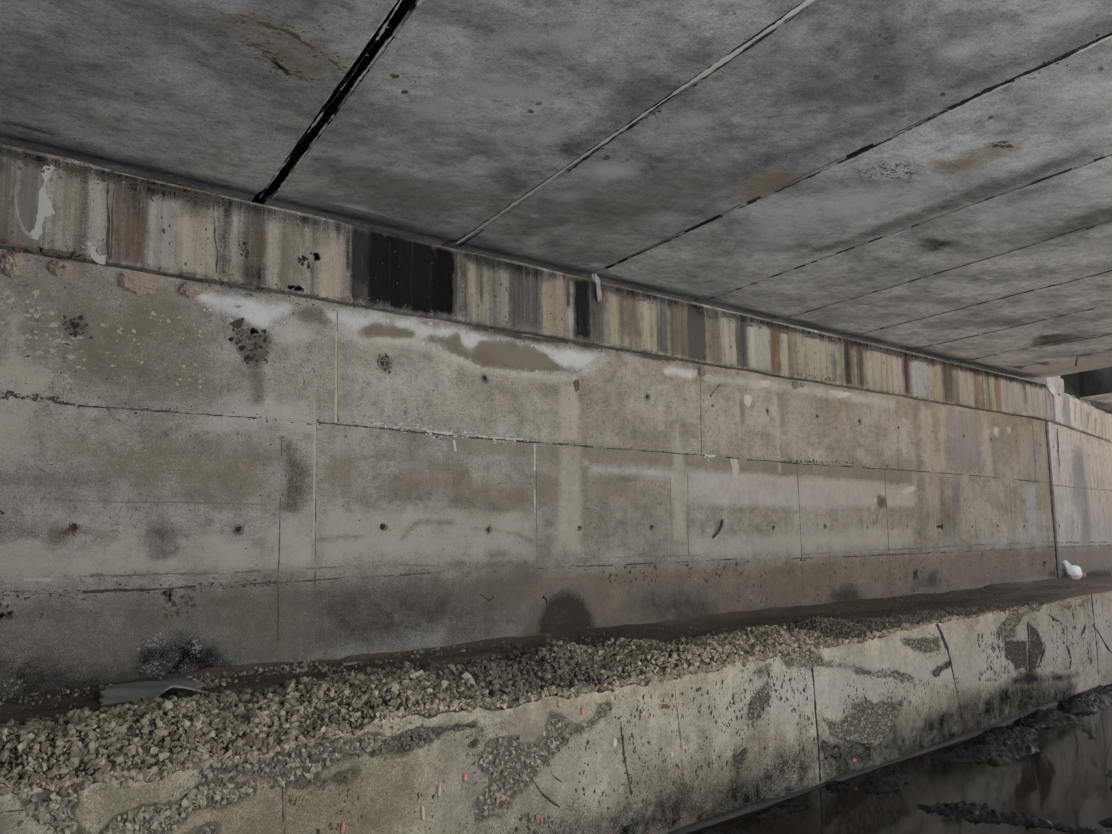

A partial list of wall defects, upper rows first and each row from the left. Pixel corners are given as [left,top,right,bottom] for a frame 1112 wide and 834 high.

water stain [189,1,358,88]
water stain [445,0,1112,270]
spalling [858,162,916,184]
peeling [0,290,203,401]
hole [228,317,271,365]
water stain [1028,333,1074,347]
water stain [0,143,1052,662]
water stain [1072,443,1091,543]